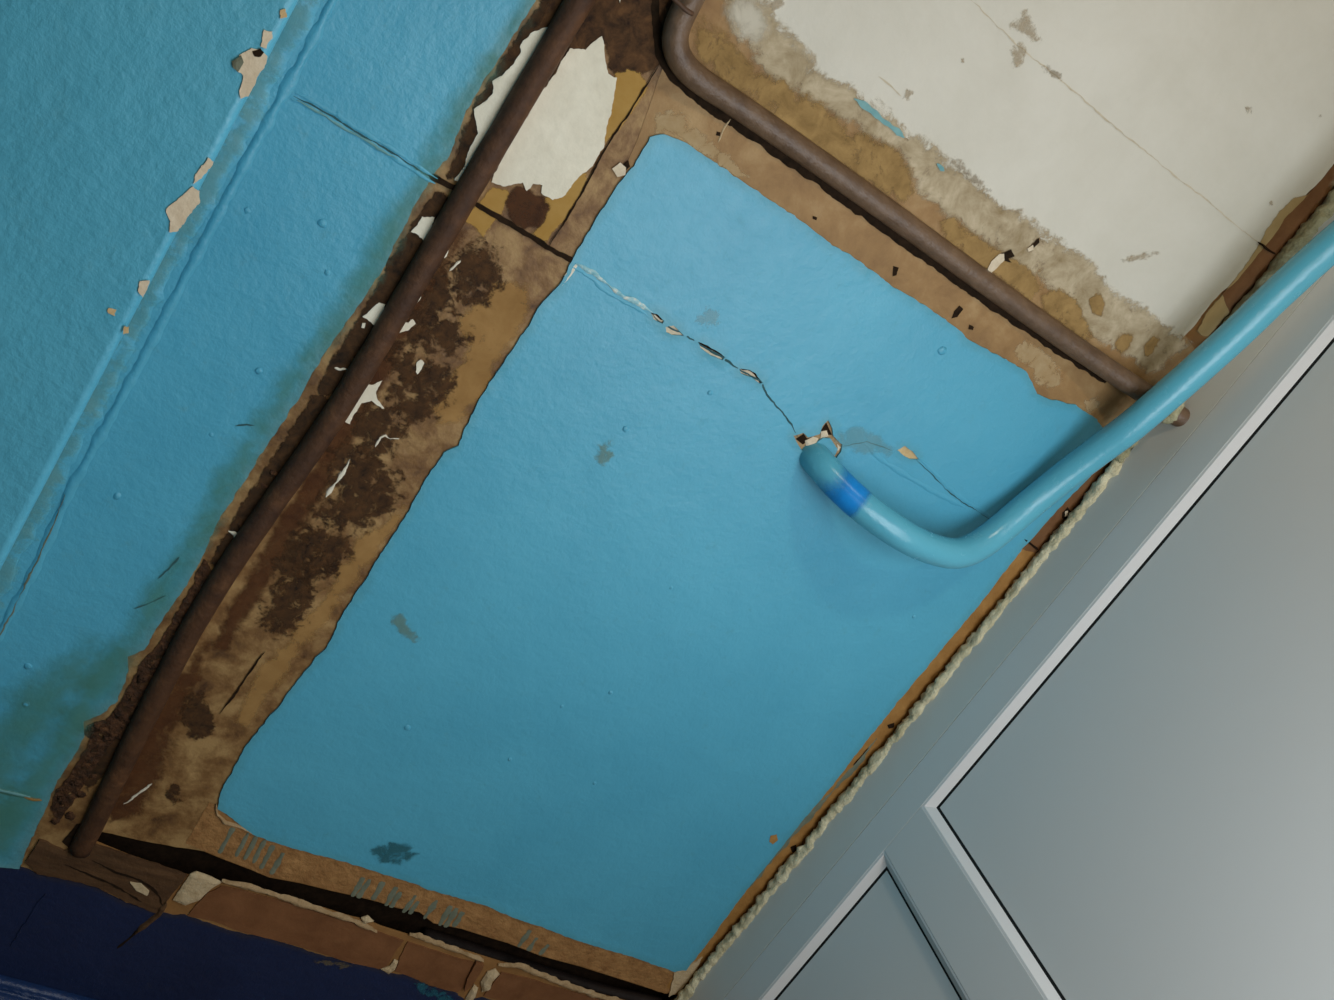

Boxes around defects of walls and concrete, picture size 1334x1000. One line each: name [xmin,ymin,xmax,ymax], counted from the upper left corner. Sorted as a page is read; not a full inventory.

rust [544,0,673,88]
crack [291,0,1107,437]
damp [655,110,749,178]
peeling [689,0,777,114]
damp [696,0,1307,373]
crack [971,0,1276,255]
peeling [21,0,547,873]
rust [49,0,563,825]
peeling [102,36,1136,1000]
damp [1015,340,1061,387]
peeling [1086,329,1195,386]
crack [66,860,163,906]